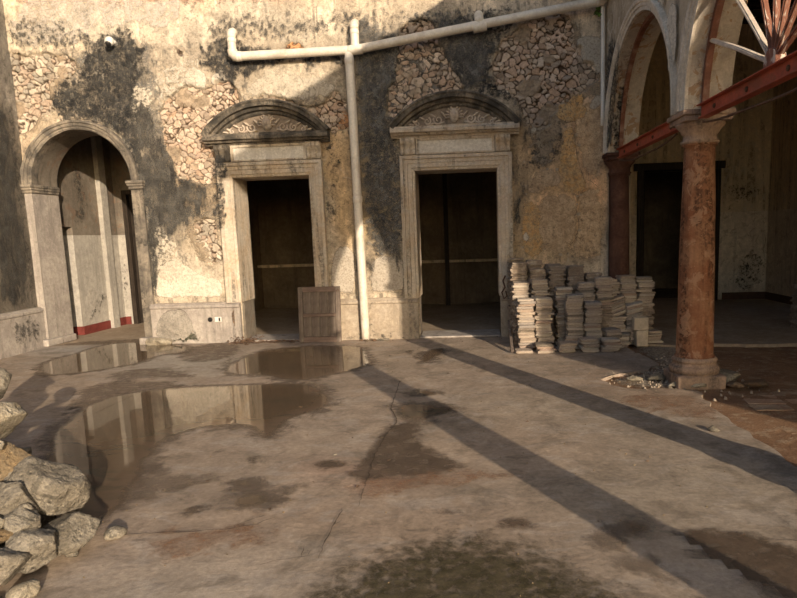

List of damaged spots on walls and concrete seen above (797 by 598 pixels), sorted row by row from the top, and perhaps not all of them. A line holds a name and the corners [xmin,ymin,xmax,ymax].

damp [0,107,33,304]
flaking render [10,0,188,137]
damp [9,15,228,294]
flaking render [132,45,349,263]
damp [199,5,519,271]
flaking render [387,19,464,118]
crack [359,381,400,504]